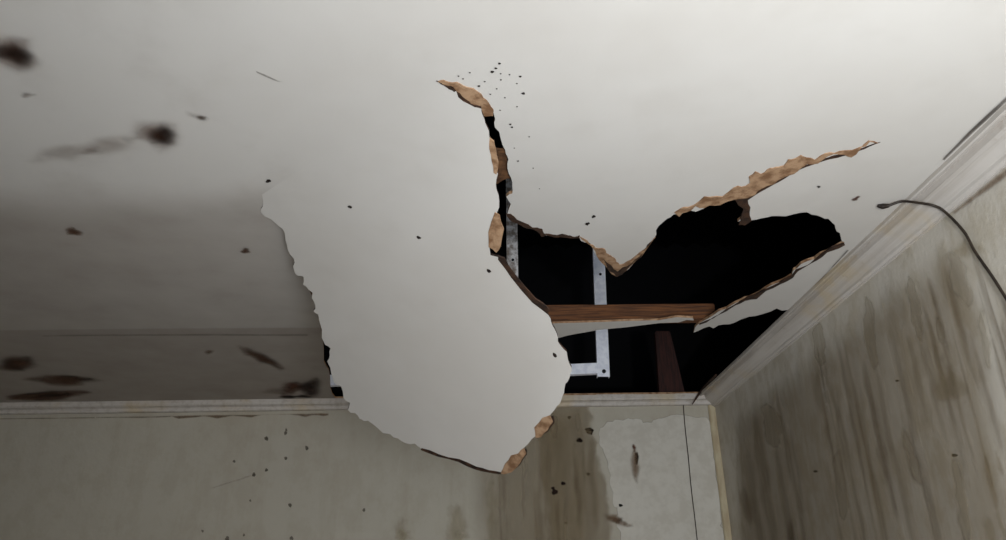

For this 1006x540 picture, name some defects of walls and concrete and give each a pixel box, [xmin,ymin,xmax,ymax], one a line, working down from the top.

leakage [0,43,29,64]
leakage [148,128,171,143]
peeling [489,138,511,184]
spalling [735,198,751,225]
spalling [488,212,656,277]
spalling [699,243,845,325]
leakage [6,360,29,370]
leakage [11,376,93,400]
leakage [281,381,318,398]
peeling [534,415,555,438]
peeling [501,448,527,474]